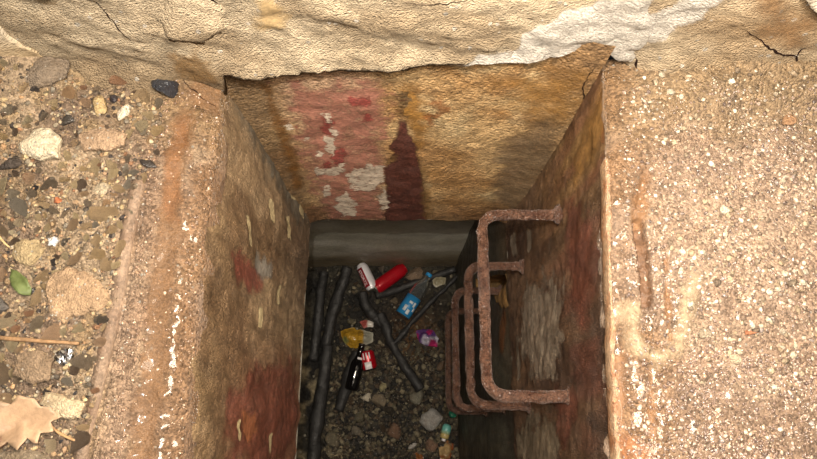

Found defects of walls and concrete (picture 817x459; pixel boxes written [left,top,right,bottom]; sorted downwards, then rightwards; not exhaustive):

spalling [624,0,817,74]
crack [746,30,807,62]
spalling [0,0,599,219]